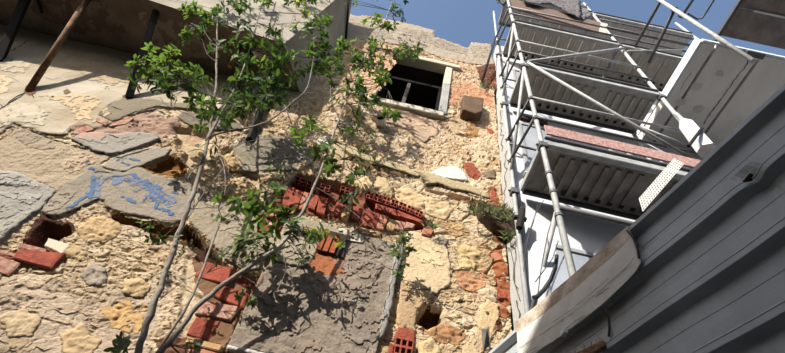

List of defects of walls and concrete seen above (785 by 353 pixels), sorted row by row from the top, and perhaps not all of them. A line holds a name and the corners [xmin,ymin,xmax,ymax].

peeling [0,96,511,353]